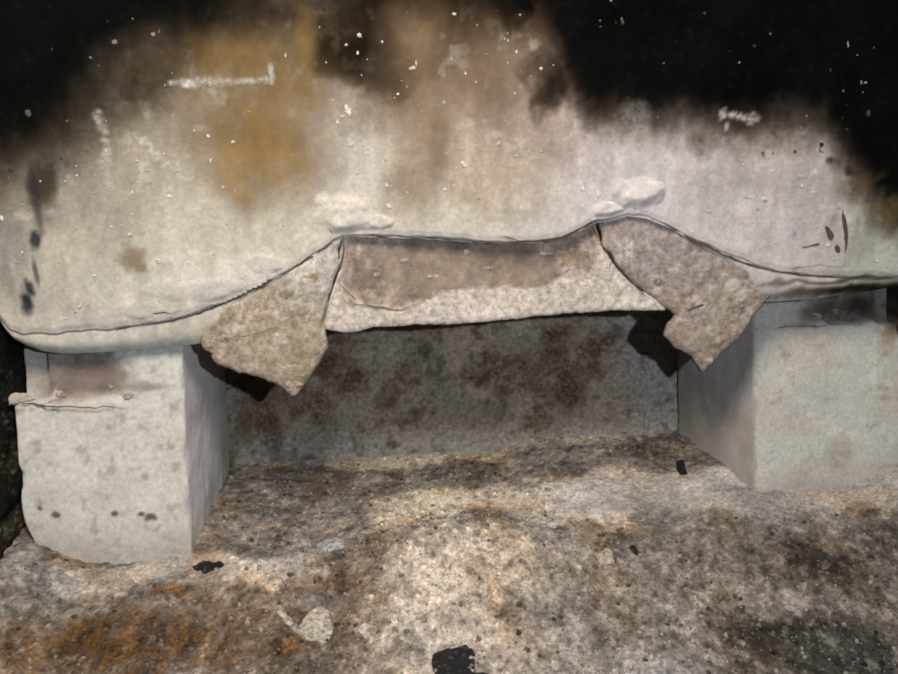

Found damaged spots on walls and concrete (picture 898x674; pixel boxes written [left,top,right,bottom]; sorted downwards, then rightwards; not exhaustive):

flaking render [200,237,342,396]
spalling [369,240,553,297]
flaking render [597,216,771,372]
rust [521,324,621,405]
crack [21,402,124,412]